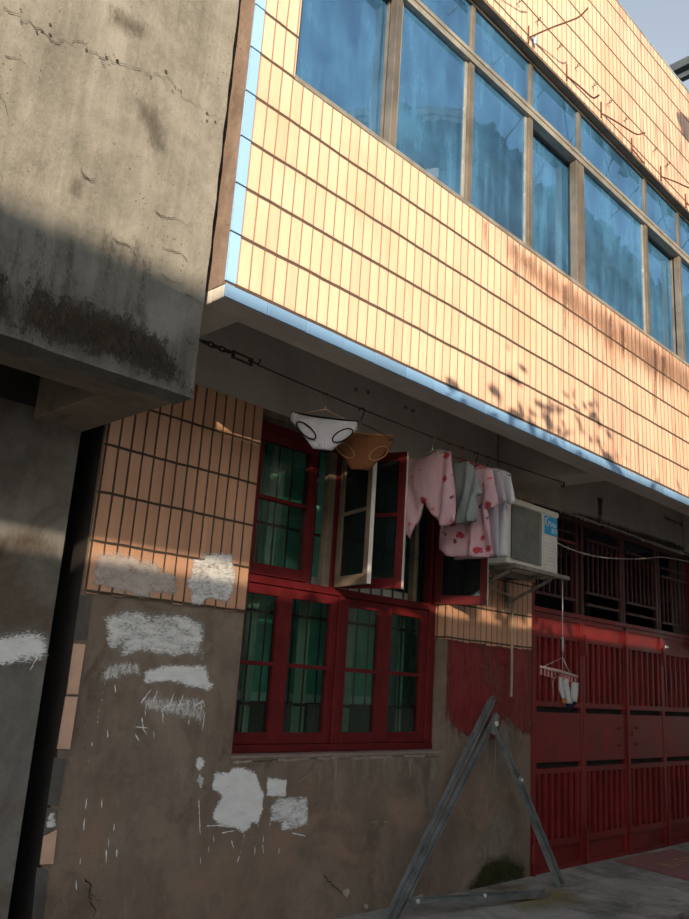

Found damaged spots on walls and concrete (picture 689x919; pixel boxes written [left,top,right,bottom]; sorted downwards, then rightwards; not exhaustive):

crack [4,7,222,125]
damp [0,274,192,396]
damp [566,289,688,391]
peeling [445,639,531,744]